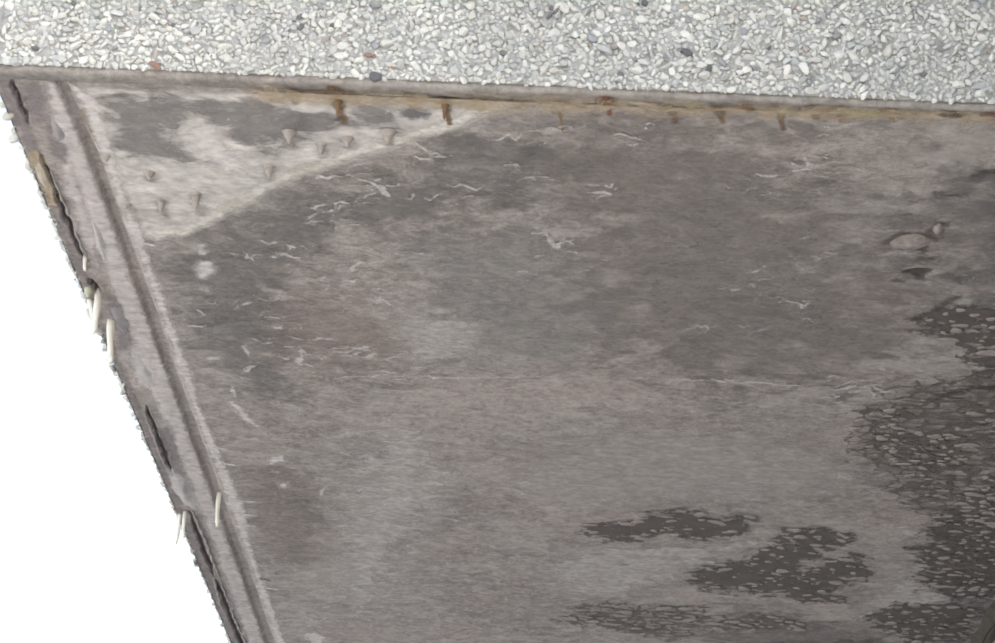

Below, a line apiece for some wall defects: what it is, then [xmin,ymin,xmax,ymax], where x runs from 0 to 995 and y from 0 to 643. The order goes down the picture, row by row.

crack [11,79,29,123]
rust [248,85,995,133]
crack [40,154,100,291]
damp [0,81,895,643]
damp [853,525,974,619]